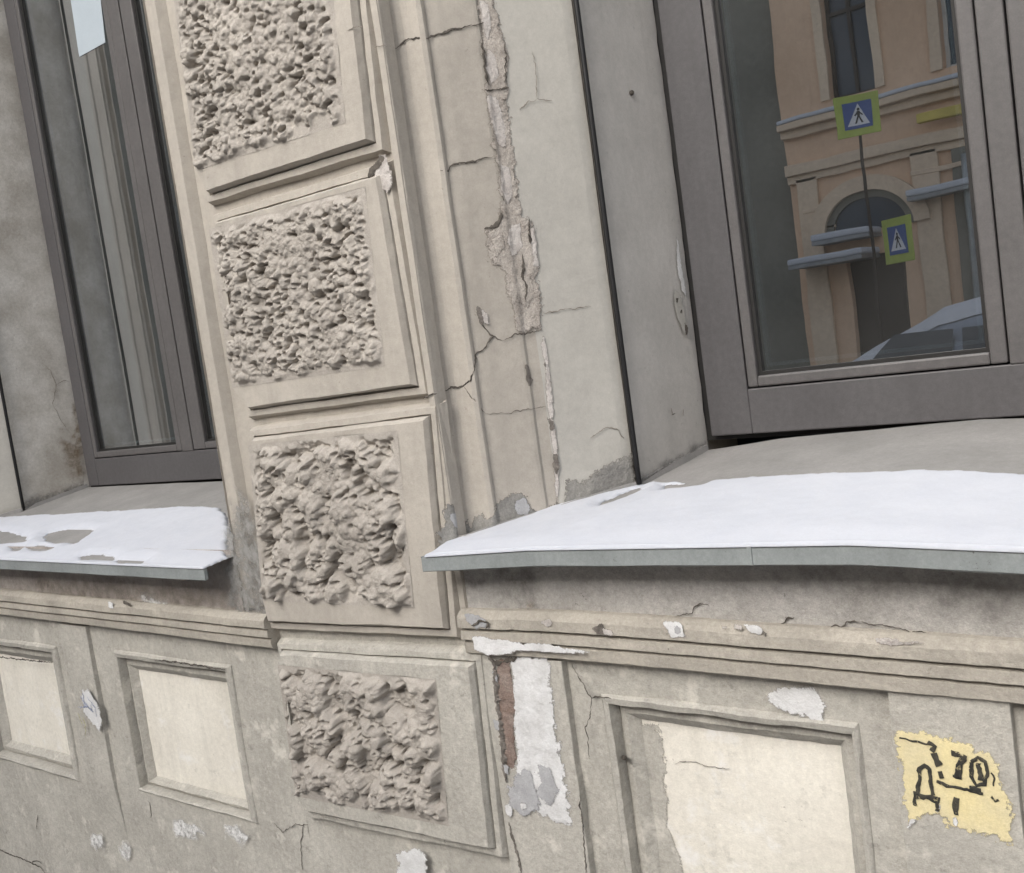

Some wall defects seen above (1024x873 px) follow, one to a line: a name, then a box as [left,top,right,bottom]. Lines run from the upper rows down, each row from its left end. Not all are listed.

crack [349,22,484,49]
spalling [362,154,393,193]
crack [440,157,492,172]
flaking render [476,0,560,503]
crack [423,306,591,414]
crack [831,620,926,633]
peeling [465,613,590,873]
crack [572,665,611,755]
peeling [767,686,827,721]
peeling [396,848,428,873]
crack [578,797,587,870]
peeling [642,723,683,873]